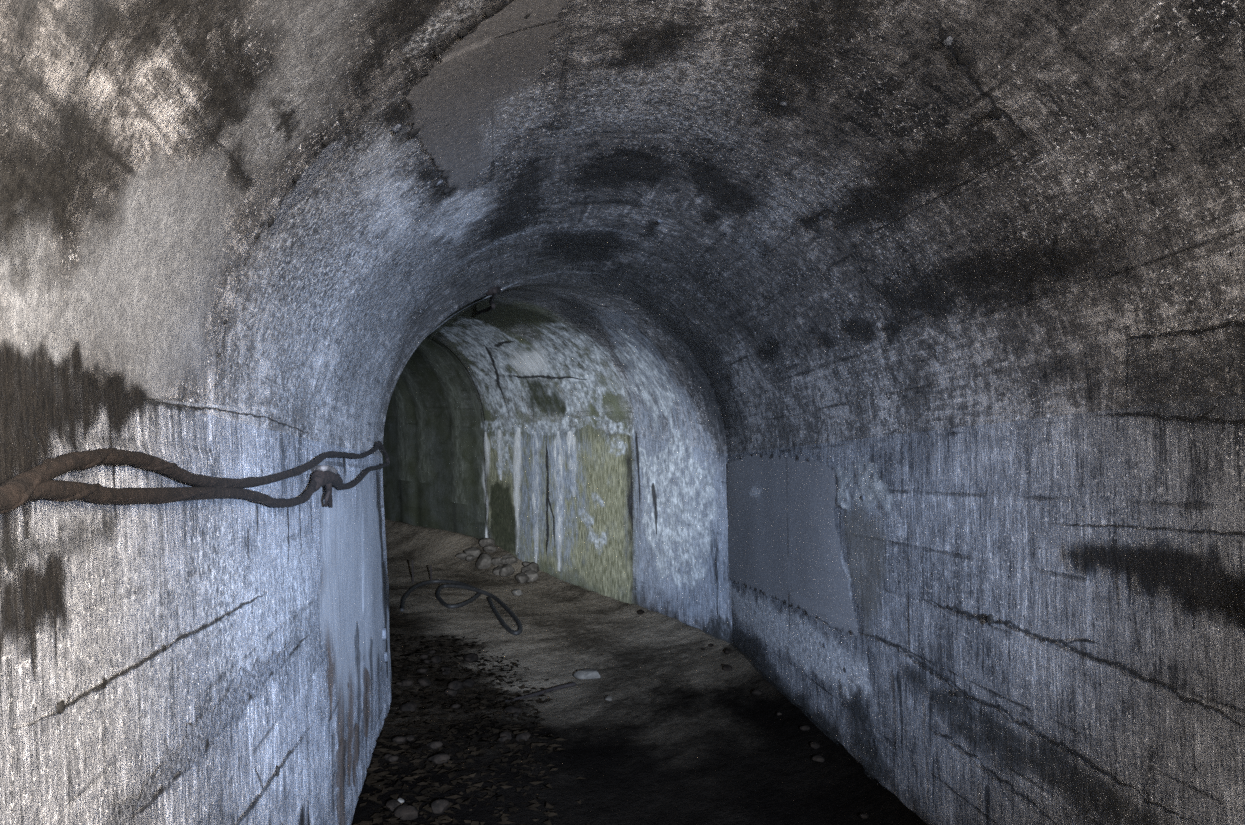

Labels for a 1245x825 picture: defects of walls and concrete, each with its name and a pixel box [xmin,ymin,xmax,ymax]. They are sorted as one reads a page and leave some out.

damp [0,0,348,486]
damp [0,501,66,680]
damp [74,505,116,541]
crack [14,591,269,729]
corrosion [326,626,370,825]
damp [434,277,892,779]
damp [896,669,1161,825]
crack [862,630,1198,825]
crack [918,595,1245,728]